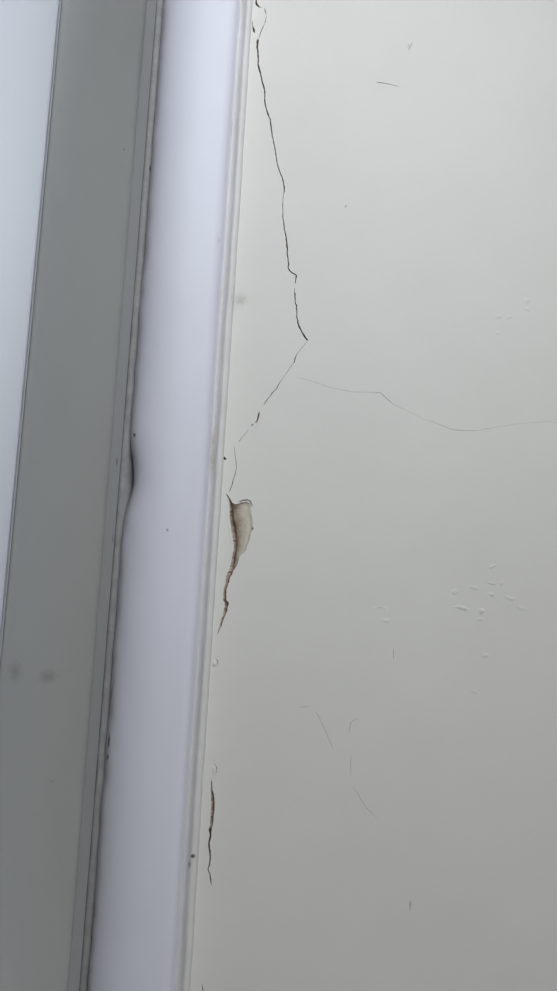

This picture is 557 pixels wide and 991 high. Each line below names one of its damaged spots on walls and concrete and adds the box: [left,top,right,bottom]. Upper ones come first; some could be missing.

crack [229,39,350,491]
flaking render [224,494,254,566]
crack [217,566,236,635]
crack [207,781,215,882]